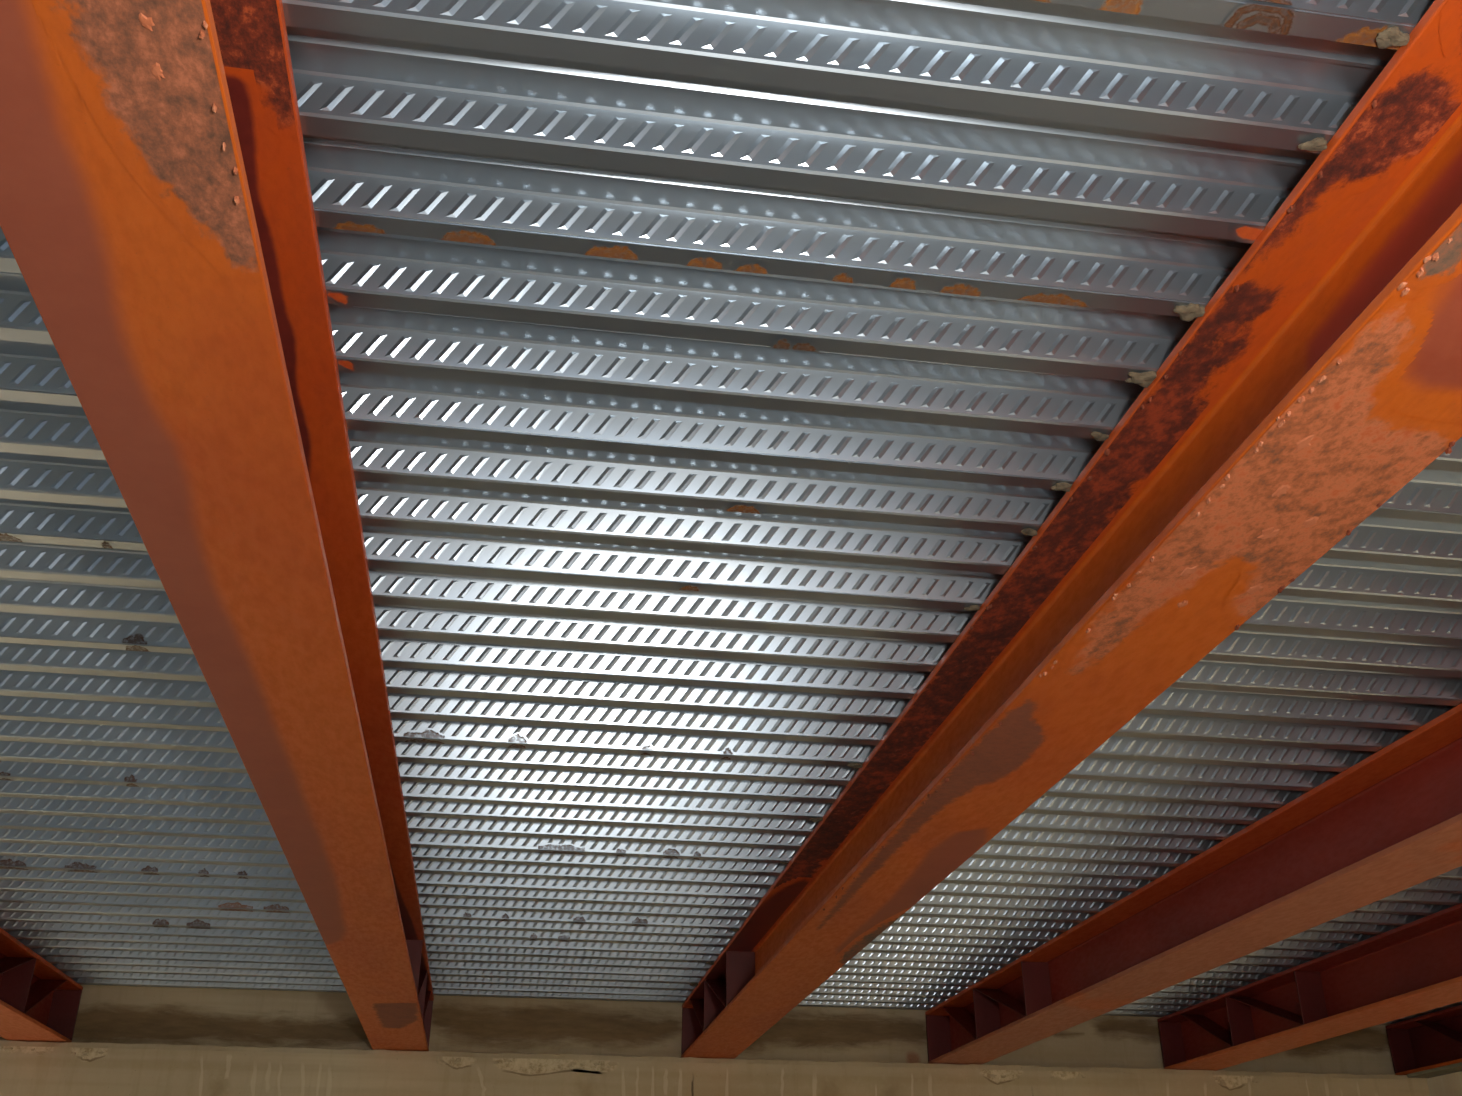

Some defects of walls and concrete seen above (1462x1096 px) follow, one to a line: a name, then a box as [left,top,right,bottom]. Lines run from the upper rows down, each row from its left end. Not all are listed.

rust [1092,0,1146,16]
rust [1221,0,1298,36]
rust [210,0,298,138]
rust [435,227,502,246]
rust [579,243,644,261]
rust [681,255,773,275]
rust [768,23,1462,889]
rust [833,907,911,967]